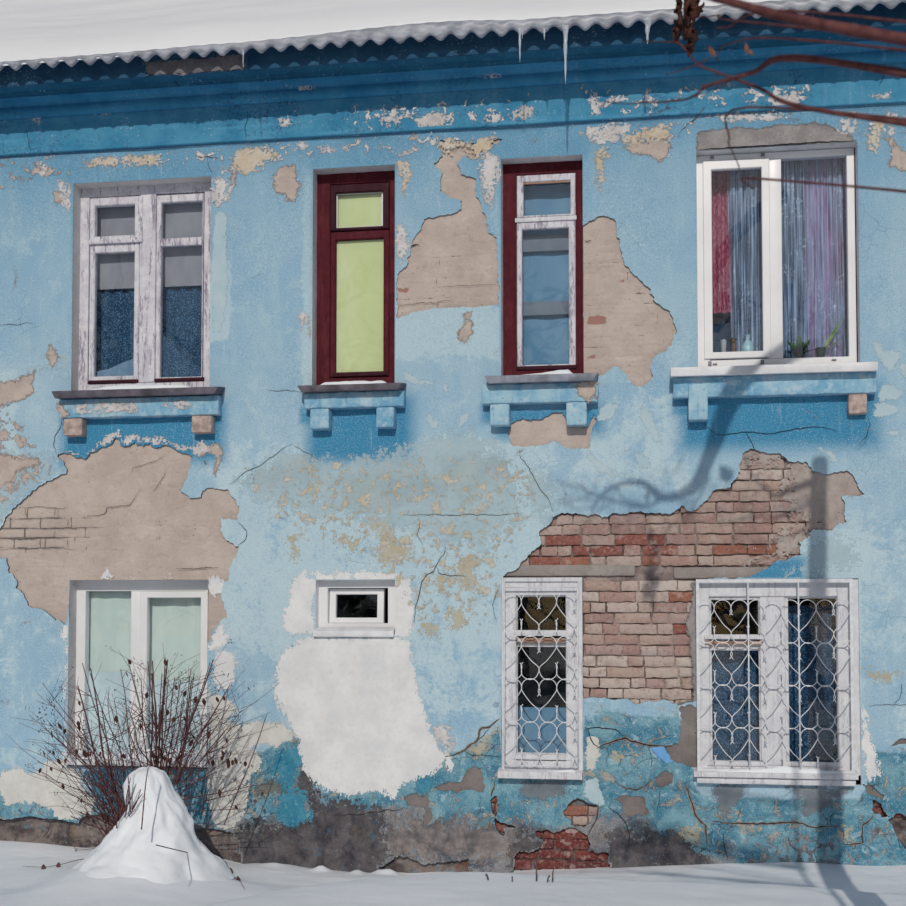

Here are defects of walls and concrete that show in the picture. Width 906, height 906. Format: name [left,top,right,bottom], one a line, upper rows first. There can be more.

peeling [572,81,812,193]
peeling [835,90,906,173]
flaking render [81,93,538,344]
crack [707,426,833,450]
peeling [0,216,863,767]
crack [414,514,506,620]
crack [587,727,667,748]
water stain [233,770,394,873]
peeling [381,778,610,873]
crack [588,779,660,850]
crack [685,785,874,862]
flaking render [862,784,906,849]